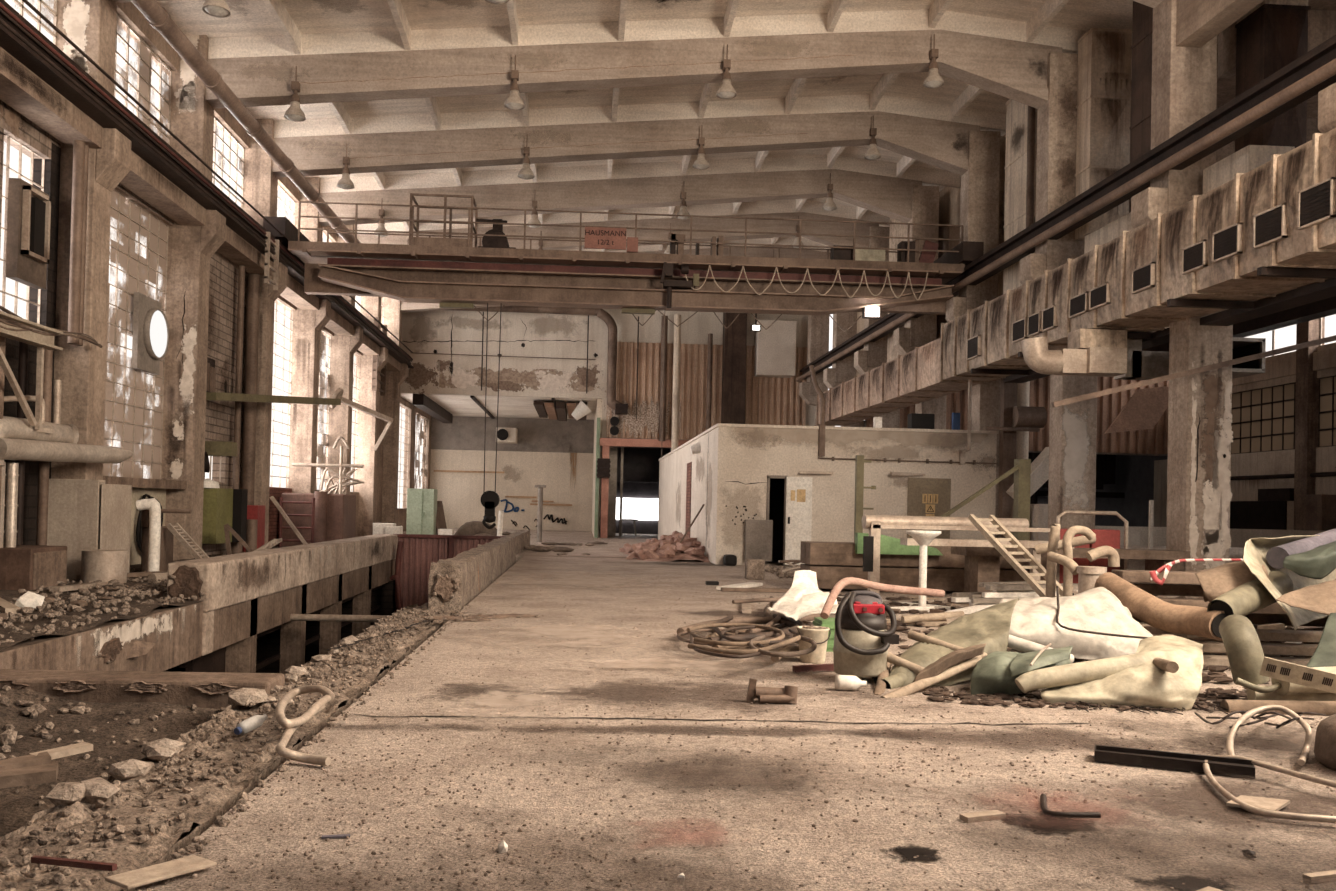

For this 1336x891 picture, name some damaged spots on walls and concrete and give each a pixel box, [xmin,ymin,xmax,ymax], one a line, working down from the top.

peeling [172,324,197,440]
peeling [405,350,681,438]
peeling [162,455,183,480]
peeling [1189,361,1233,569]
spalling [96,637,124,664]